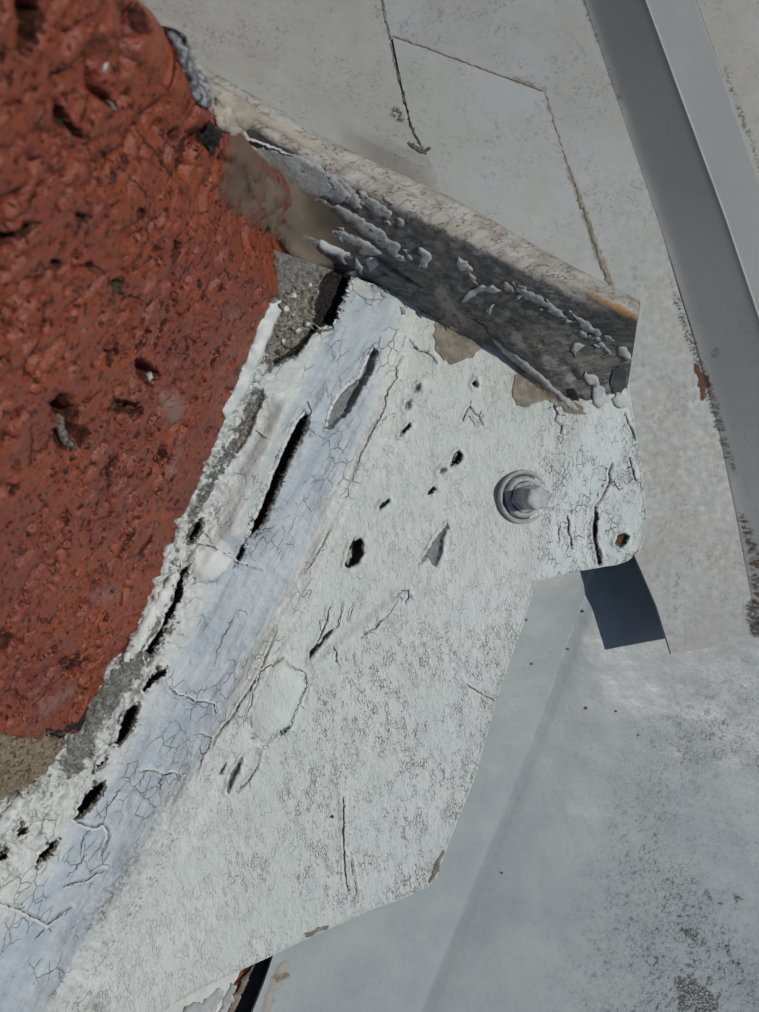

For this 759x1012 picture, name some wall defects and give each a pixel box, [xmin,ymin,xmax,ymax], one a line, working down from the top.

peeling [251,146,432,300]
crack [352,339,435,480]
spalling [433,316,490,365]
peeling [457,257,632,361]
spalling [513,371,629,414]
corrosion [695,363,711,400]
crack [558,414,637,565]
spalling [419,523,448,567]
crack [316,588,415,666]
crack [0,632,310,938]
crack [342,798,357,902]
peeling [162,963,256,1012]